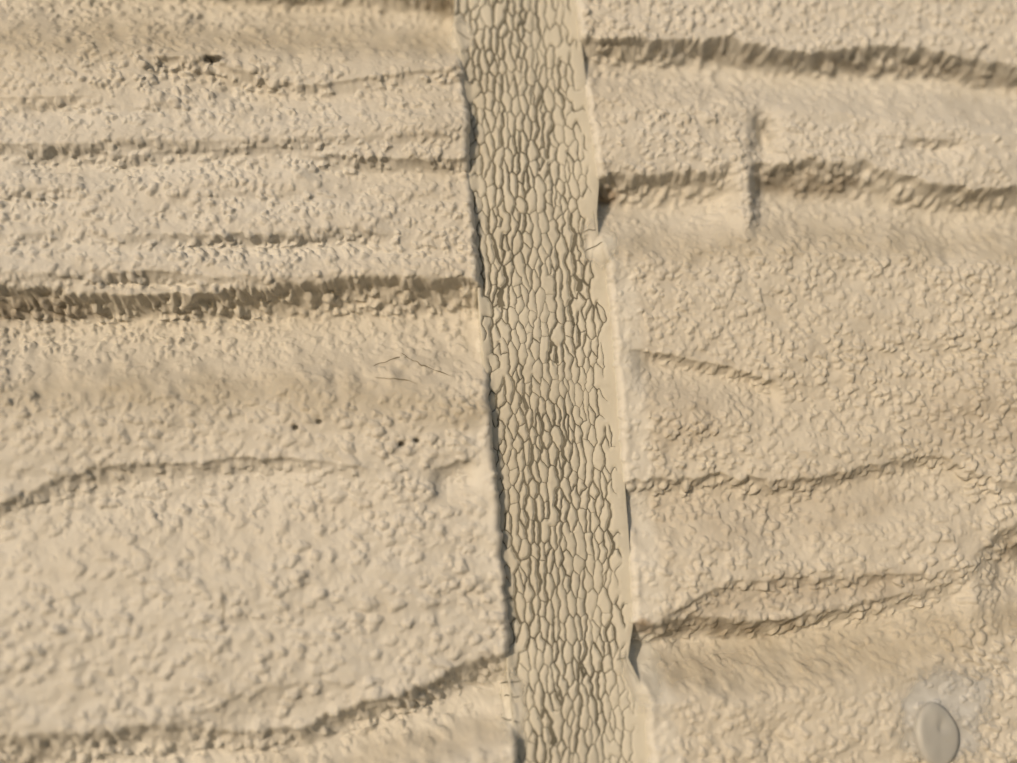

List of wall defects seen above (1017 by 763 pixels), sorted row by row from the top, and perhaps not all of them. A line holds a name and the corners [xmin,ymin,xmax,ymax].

crack [455,0,636,763]